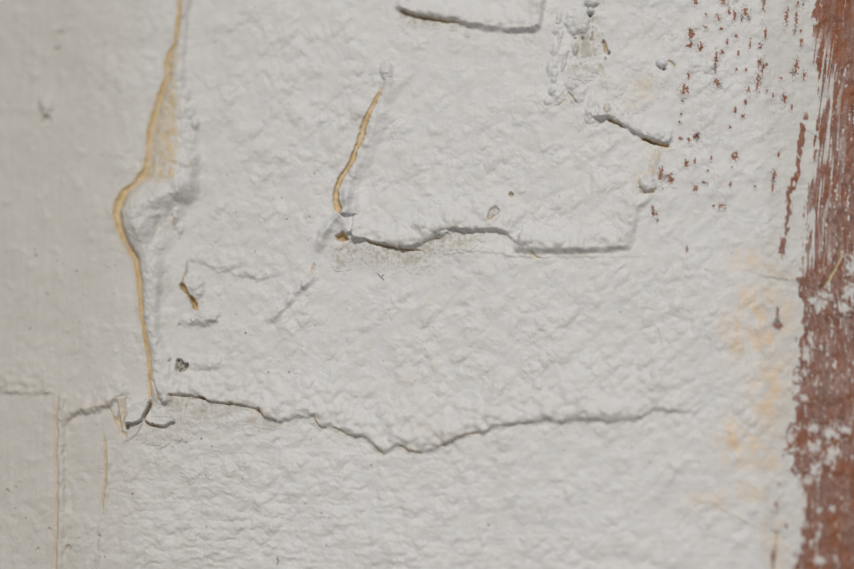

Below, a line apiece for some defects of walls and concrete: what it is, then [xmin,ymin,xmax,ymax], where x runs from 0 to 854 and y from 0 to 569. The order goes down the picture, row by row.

spalling [485,204,503,221]
peeling [647,203,662,224]
peeling [788,244,854,405]
spalling [167,357,192,375]
peeling [105,395,174,445]
crack [313,414,549,455]
peeling [783,415,854,489]
crack [53,393,66,569]
crack [96,424,113,568]
peeling [768,543,779,568]
peeling [791,503,836,569]